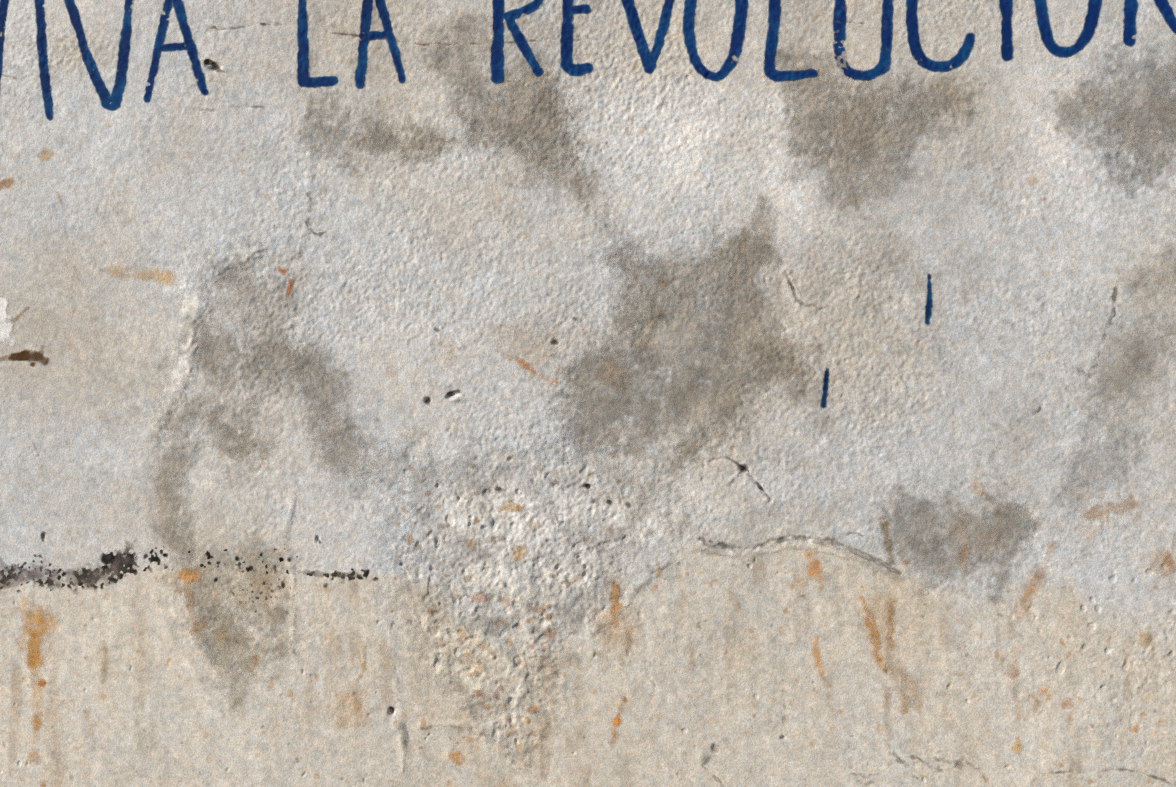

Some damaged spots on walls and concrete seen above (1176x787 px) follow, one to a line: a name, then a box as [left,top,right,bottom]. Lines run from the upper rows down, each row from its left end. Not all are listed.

water stain [305,97,348,156]
water stain [463,76,591,196]
water stain [774,53,973,210]
water stain [1056,57,1176,186]
peeling [0,297,16,349]
water stain [195,324,365,469]
water stain [557,216,806,467]
water stain [0,409,297,671]
water stain [307,569,377,587]
crack [761,535,901,575]
water stain [882,487,1033,600]
corrosion [25,613,46,668]